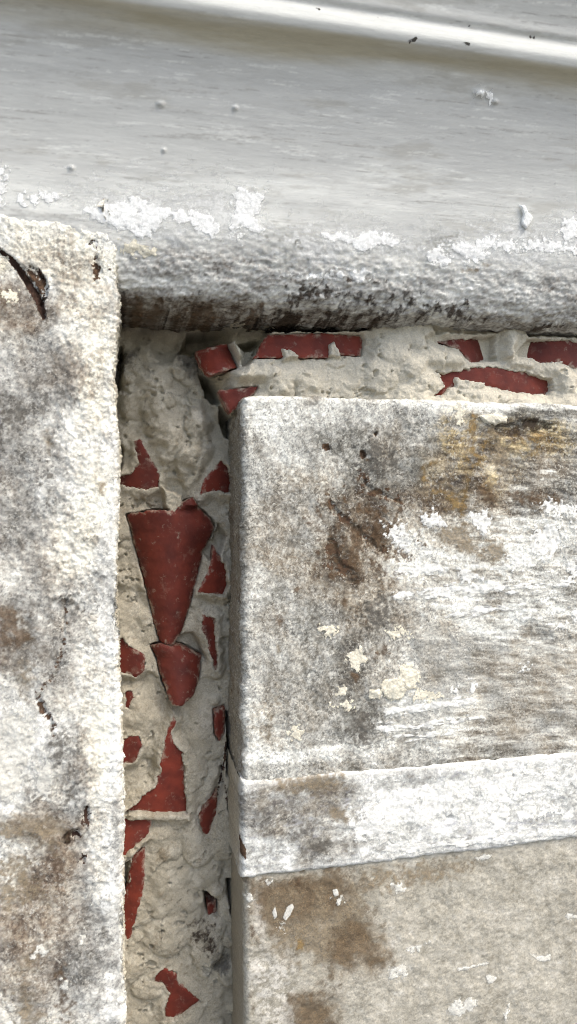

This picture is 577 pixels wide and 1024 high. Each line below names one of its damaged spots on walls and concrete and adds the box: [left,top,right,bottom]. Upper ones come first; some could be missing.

peeling [0,165,577,293]
peeling [0,289,20,304]
crack [0,248,49,320]
leakage [247,854,492,977]
leakage [287,993,334,1024]